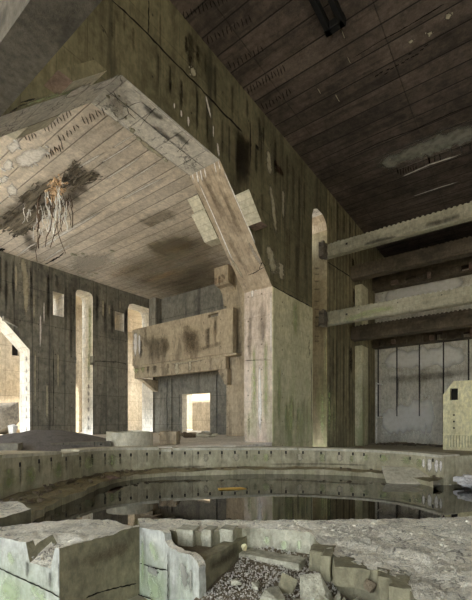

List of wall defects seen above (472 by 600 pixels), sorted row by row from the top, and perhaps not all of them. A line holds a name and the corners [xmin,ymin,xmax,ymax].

crack [112,0,252,167]
peeling [0,139,50,198]
water stain [192,168,233,260]
water stain [206,97,254,241]